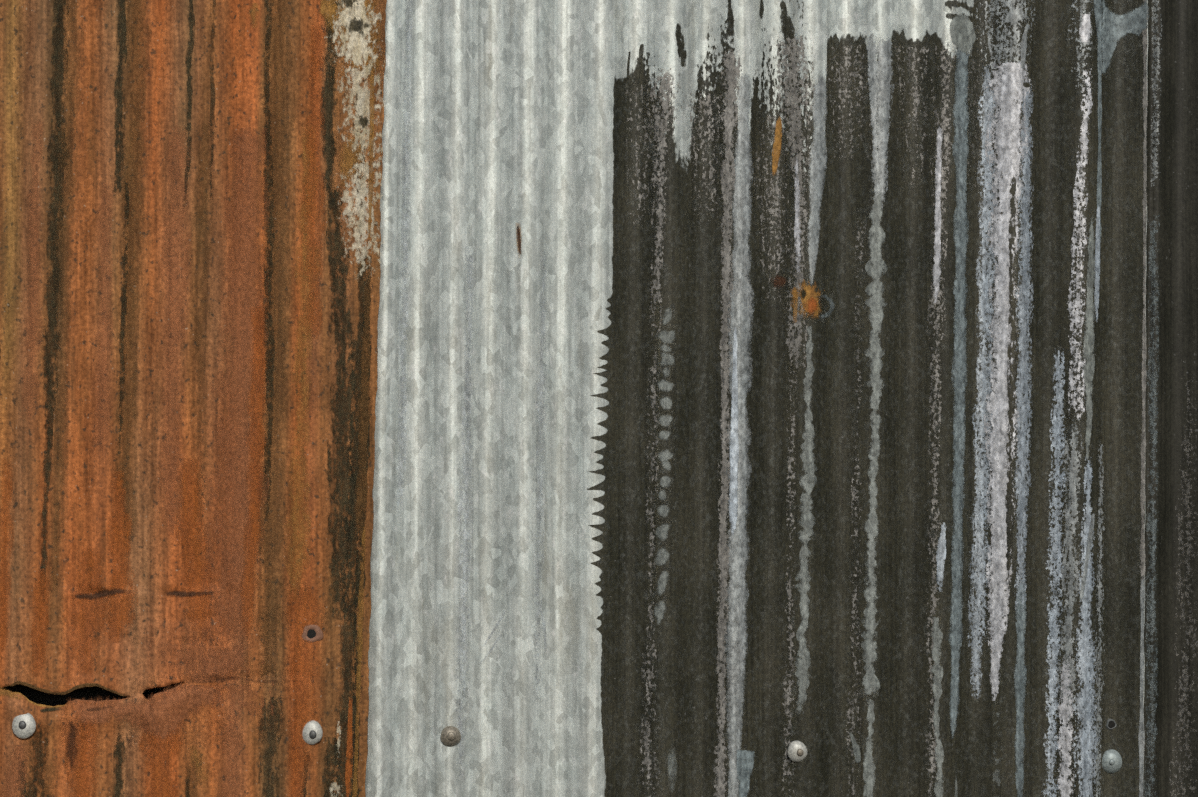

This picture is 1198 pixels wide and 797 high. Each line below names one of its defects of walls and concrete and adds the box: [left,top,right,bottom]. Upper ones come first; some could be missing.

peeling [324,0,383,275]
rust [774,277,819,318]
rust [345,282,371,797]
crack [0,685,220,766]